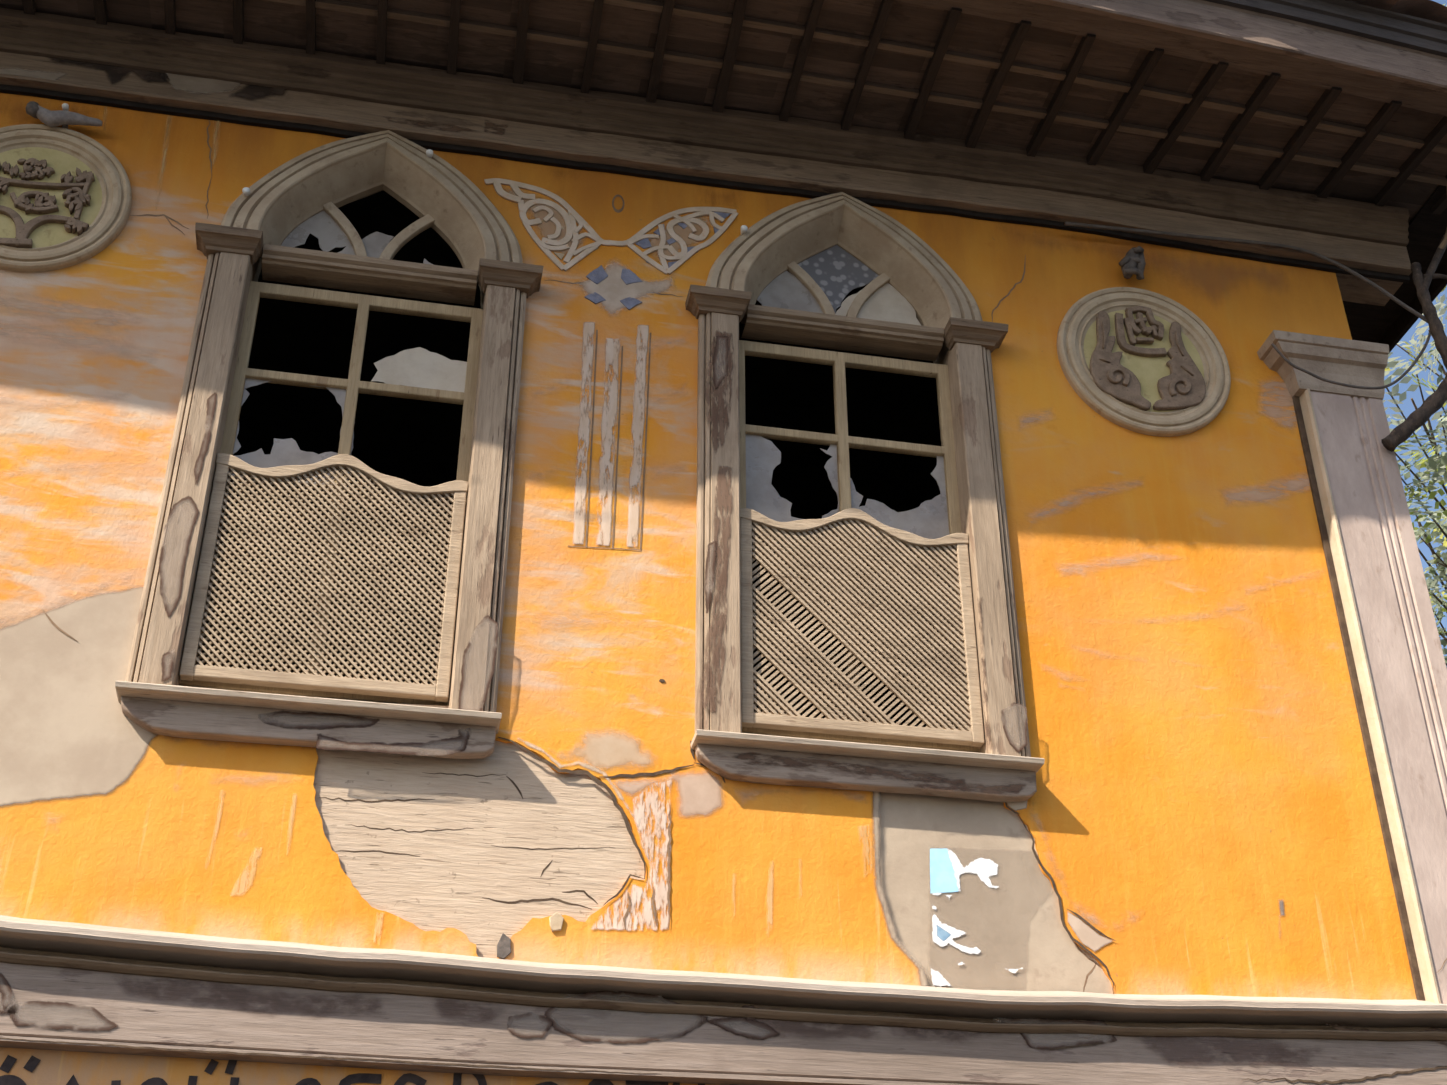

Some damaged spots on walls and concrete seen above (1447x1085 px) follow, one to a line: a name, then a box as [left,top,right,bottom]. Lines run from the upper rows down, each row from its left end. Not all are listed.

crack [130,121,212,235]
crack [992,255,1026,322]
peeling [391,615,498,711]
spalling [259,711,672,959]
spalling [735,752,1116,994]
peeling [0,973,118,1031]
peeling [507,991,779,1044]